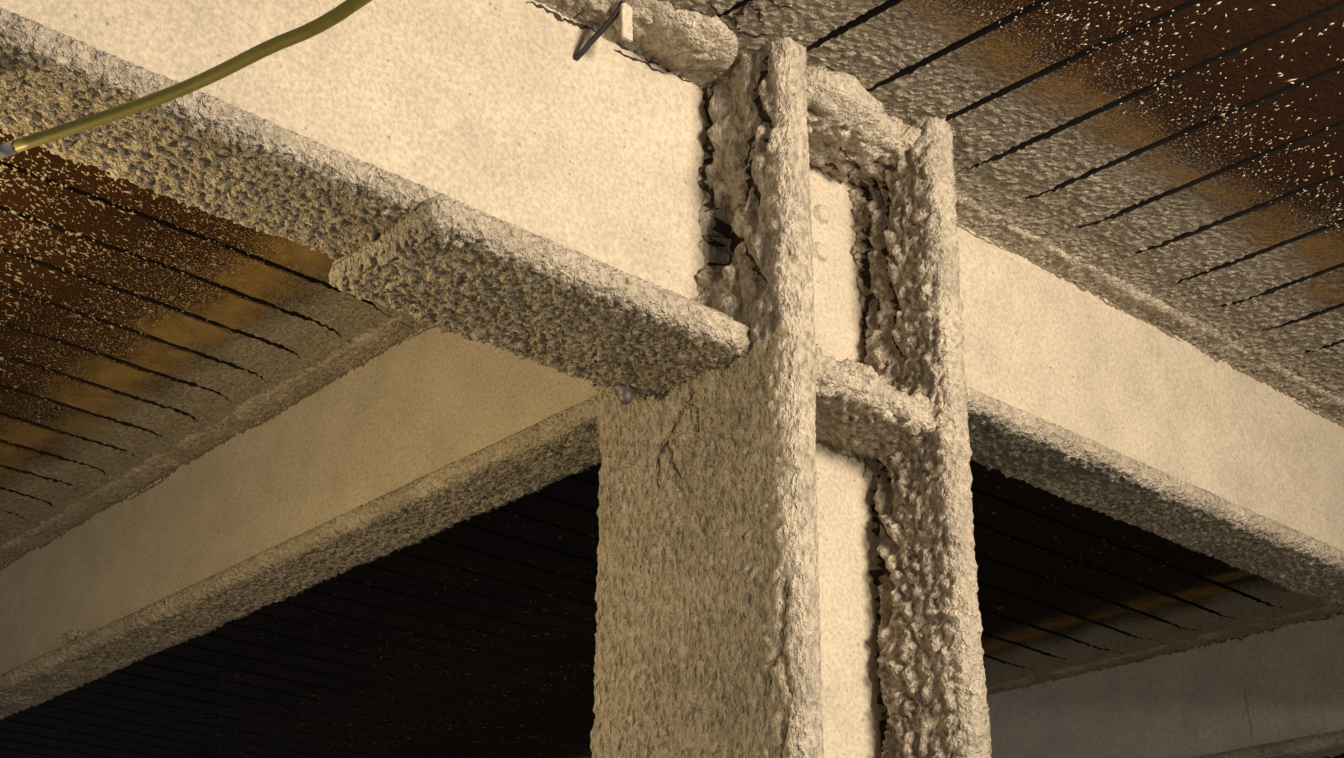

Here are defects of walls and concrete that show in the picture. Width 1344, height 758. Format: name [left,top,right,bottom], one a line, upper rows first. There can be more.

spalling [722,185,749,287]
corrosion [62,242,327,427]
corrosion [0,425,55,473]
crack [769,582,794,758]